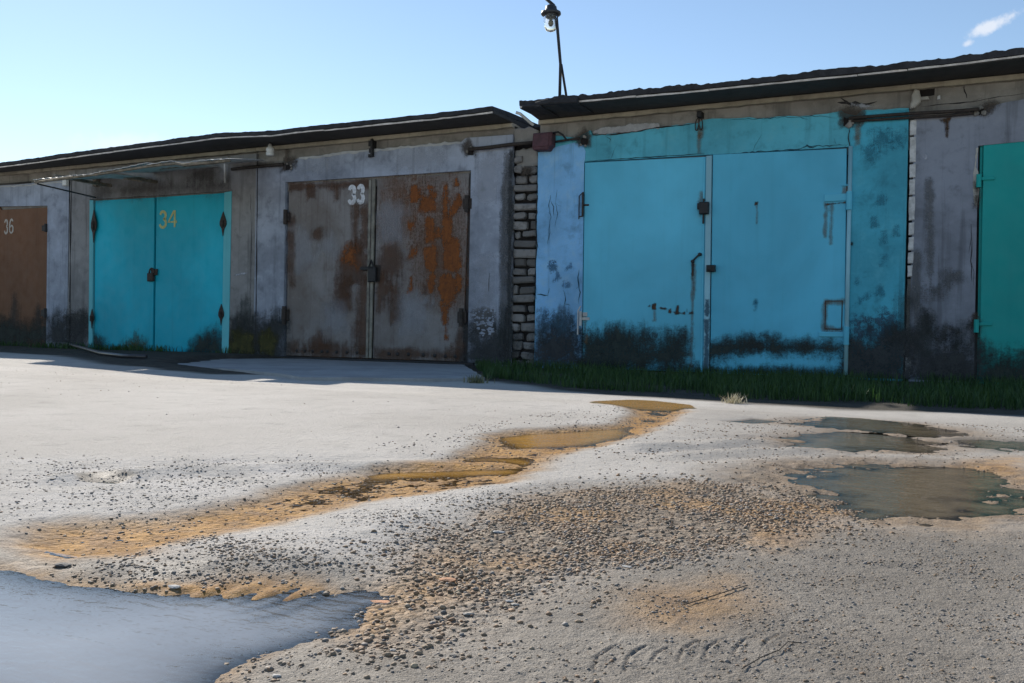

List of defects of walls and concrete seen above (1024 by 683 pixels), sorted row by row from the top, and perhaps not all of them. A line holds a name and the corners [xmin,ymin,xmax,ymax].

water stain [188,313,290,356]
rust [289,178,465,362]
water stain [459,150,1024,383]